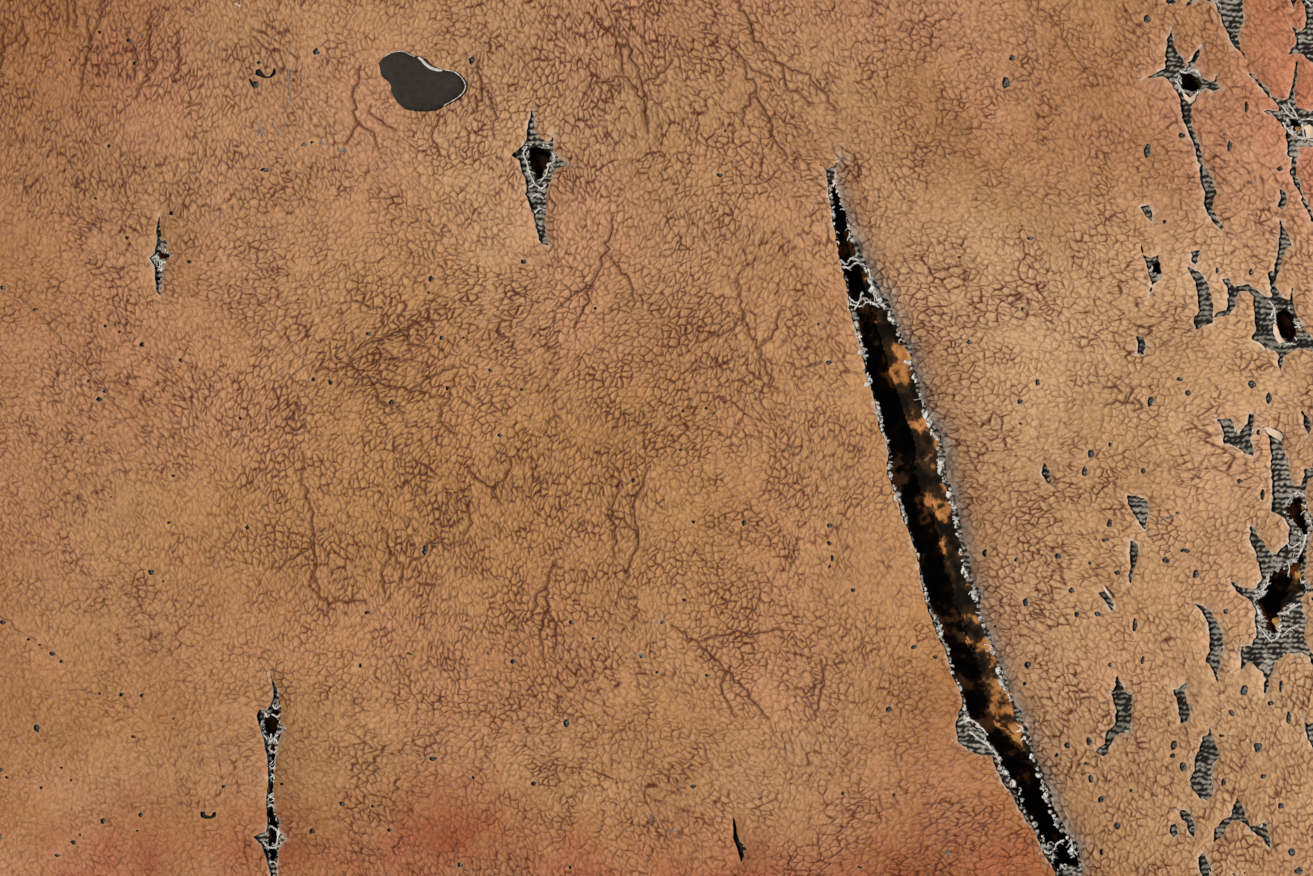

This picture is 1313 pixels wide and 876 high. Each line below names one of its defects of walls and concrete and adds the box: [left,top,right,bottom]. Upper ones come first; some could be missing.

peeling [1166,0,1246,59]
peeling [1289,0,1313,62]
peeling [1188,189,1313,370]
peeling [1127,495,1148,529]
peeling [1114,541,1138,583]
peeling [1217,411,1313,706]
peeling [1195,604,1228,681]
crack [798,662,825,711]
peeling [1173,683,1190,723]
peeling [1170,728,1226,800]
peeling [1169,810,1195,837]
peeling [1198,798,1270,876]